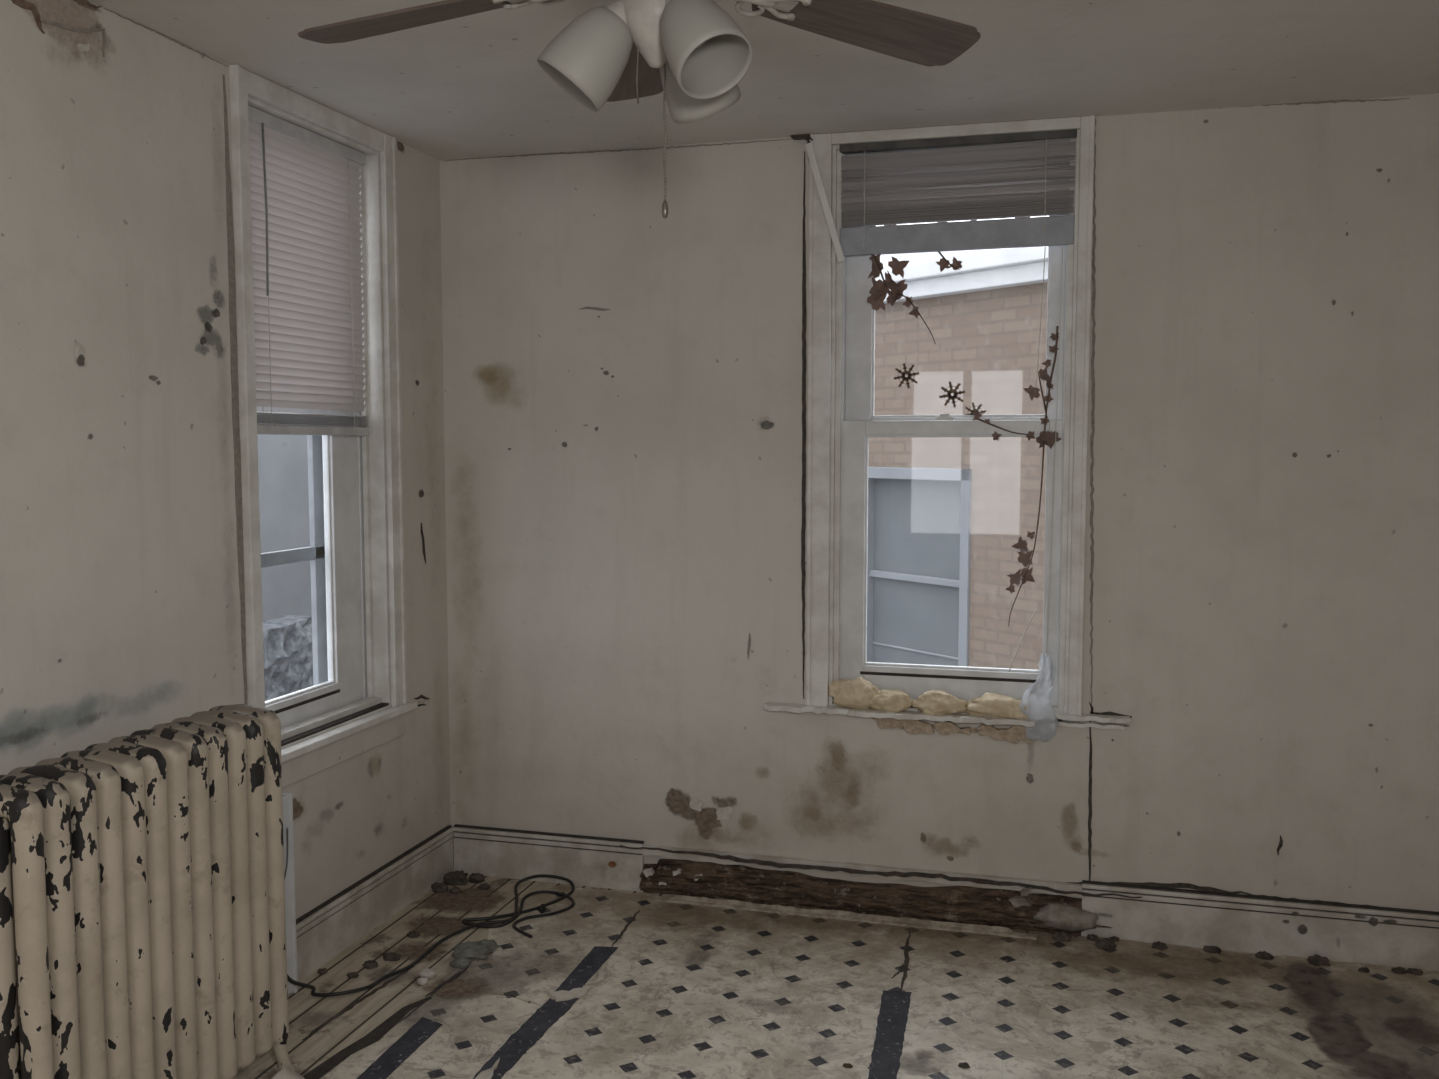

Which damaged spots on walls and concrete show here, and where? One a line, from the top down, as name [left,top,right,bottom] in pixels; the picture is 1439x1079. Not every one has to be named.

flaking render [11,0,106,57]
crack [620,119,1379,907]
flaking render [870,717,1034,744]
flaking render [666,788,736,839]
peeling [643,867,703,885]